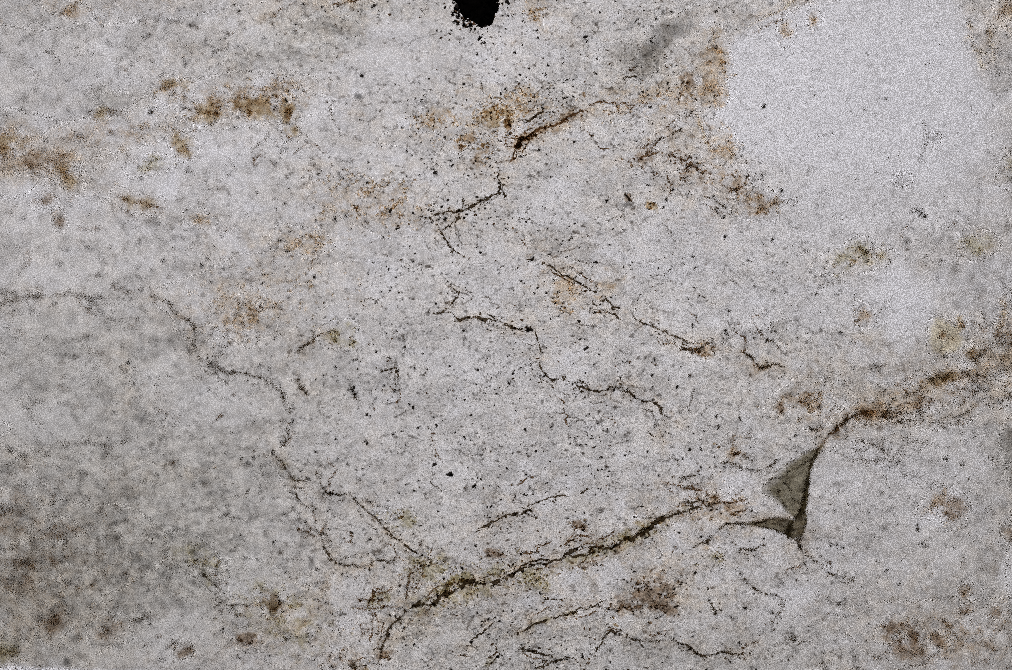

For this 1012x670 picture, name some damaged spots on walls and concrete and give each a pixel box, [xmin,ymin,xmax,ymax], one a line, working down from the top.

corrosion [119,72,310,173]
crack [418,67,647,258]
corrosion [600,33,736,114]
crack [635,110,730,218]
corrosion [621,126,785,224]
crack [0,290,112,311]
crack [526,256,801,375]
corrosion [773,389,838,424]
corrosion [828,242,889,277]
crack [809,311,1012,467]
corrosion [836,301,1012,426]
crack [154,284,811,670]